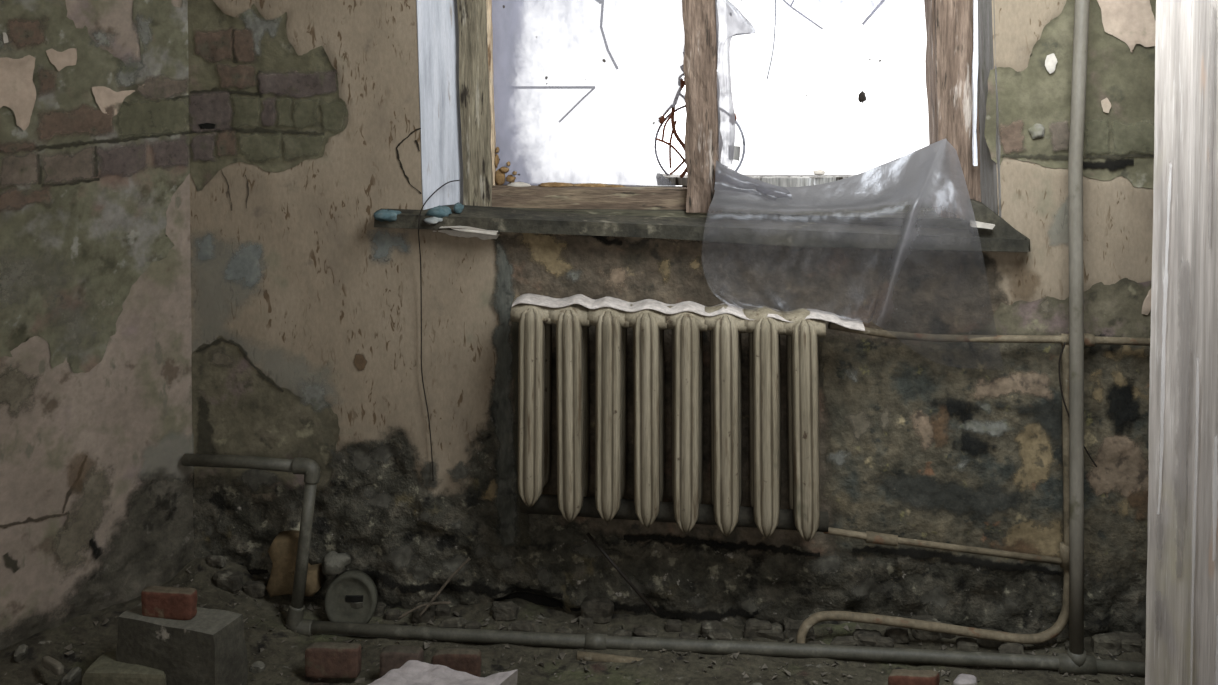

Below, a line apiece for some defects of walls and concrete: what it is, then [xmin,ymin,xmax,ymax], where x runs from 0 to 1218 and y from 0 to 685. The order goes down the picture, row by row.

spalling [984,0,1156,189]
peeling [0,0,349,418]
leakage [1049,199,1069,244]
peeling [950,296,1069,345]
peeling [1084,278,1152,348]
crack [0,456,87,529]
peeling [192,335,340,494]
leakage [0,230,1069,650]
leakage [1084,165,1172,639]
spalling [494,592,563,609]